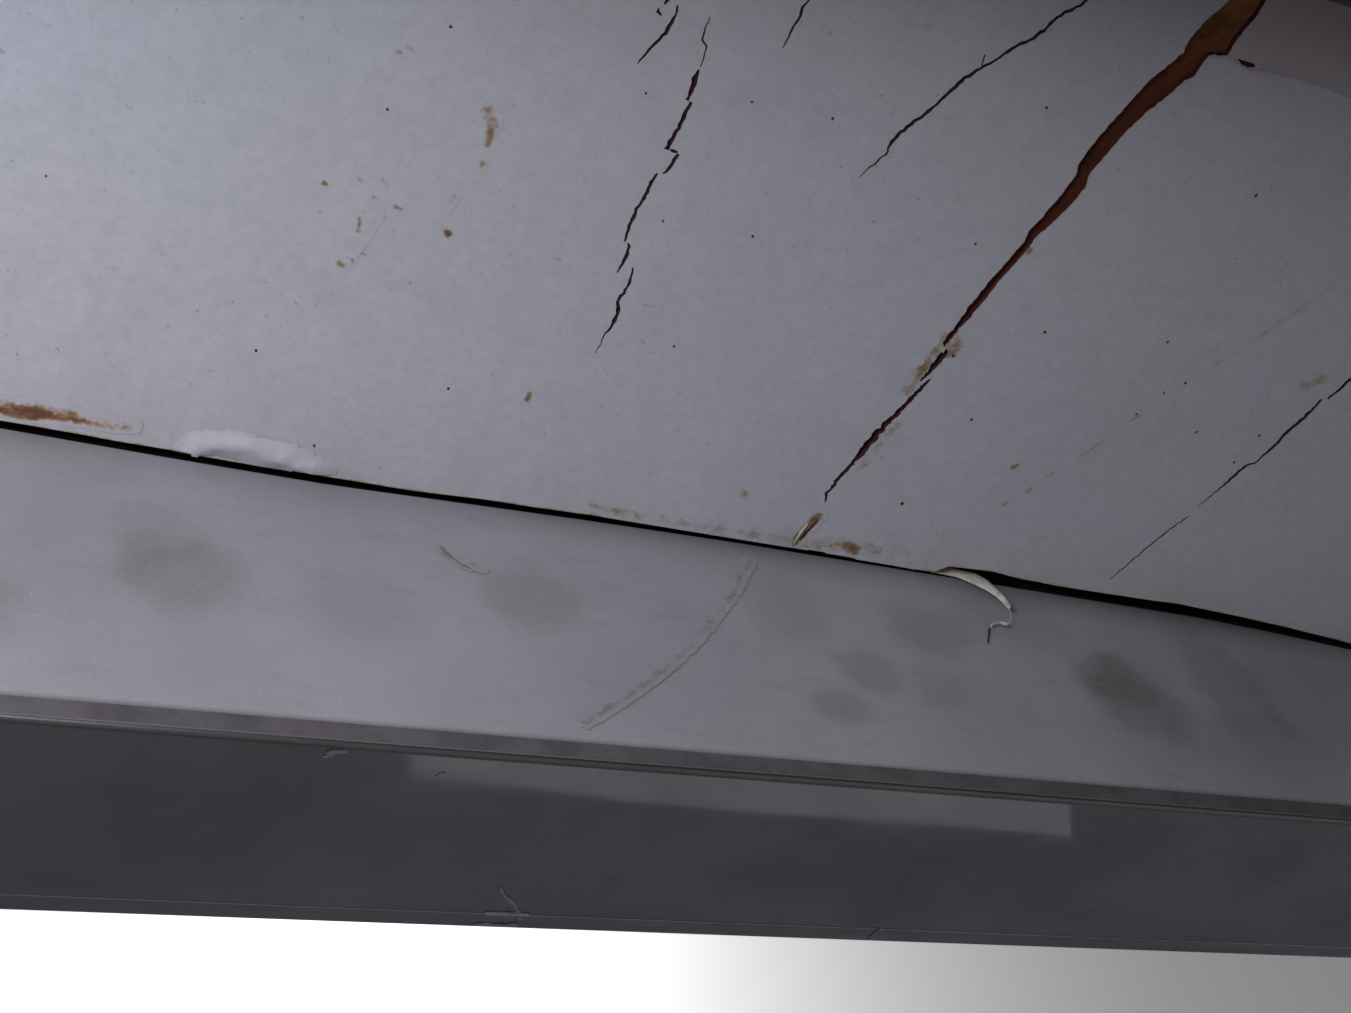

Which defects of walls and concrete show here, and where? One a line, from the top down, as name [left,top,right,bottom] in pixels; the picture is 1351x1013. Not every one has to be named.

crack [783,0,810,49]
crack [595,0,710,353]
crack [794,0,1266,544]
corrosion [0,395,143,435]
crack [1110,378,1351,579]
peeling [931,567,1012,643]